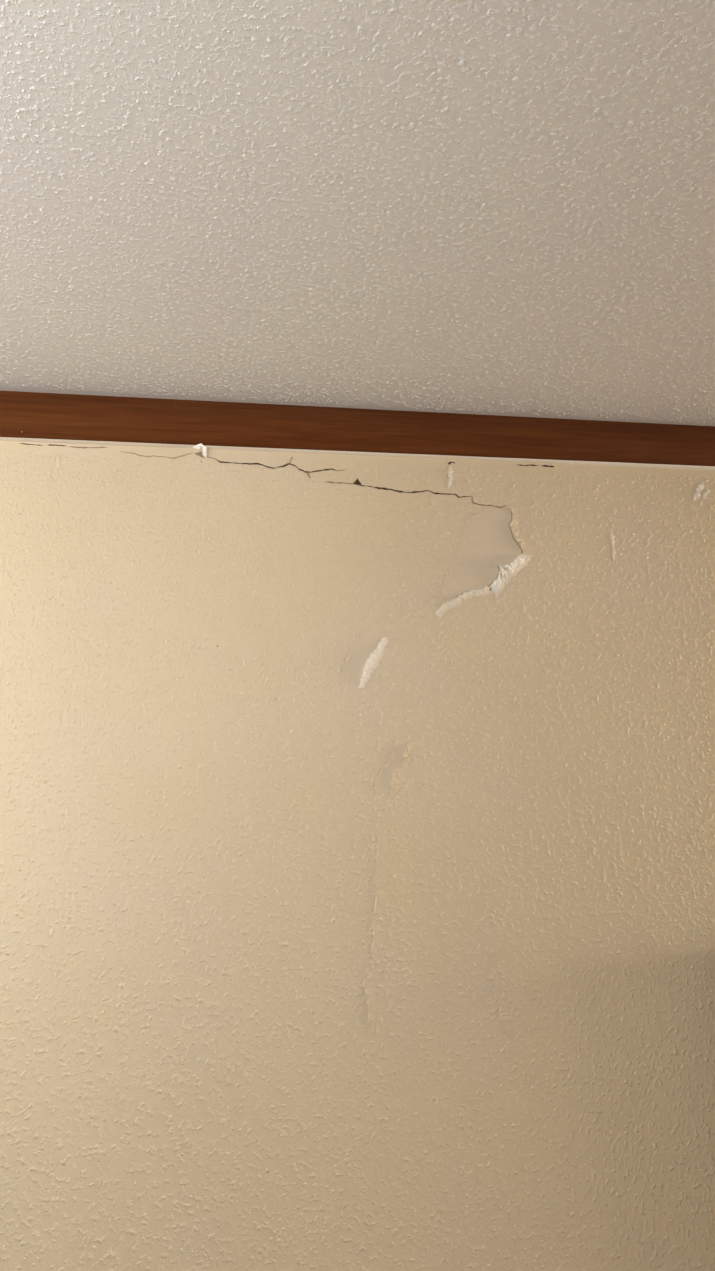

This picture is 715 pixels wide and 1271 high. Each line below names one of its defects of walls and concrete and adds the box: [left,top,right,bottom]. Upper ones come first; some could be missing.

crack [120,451,507,508]
peeling [435,503,536,618]